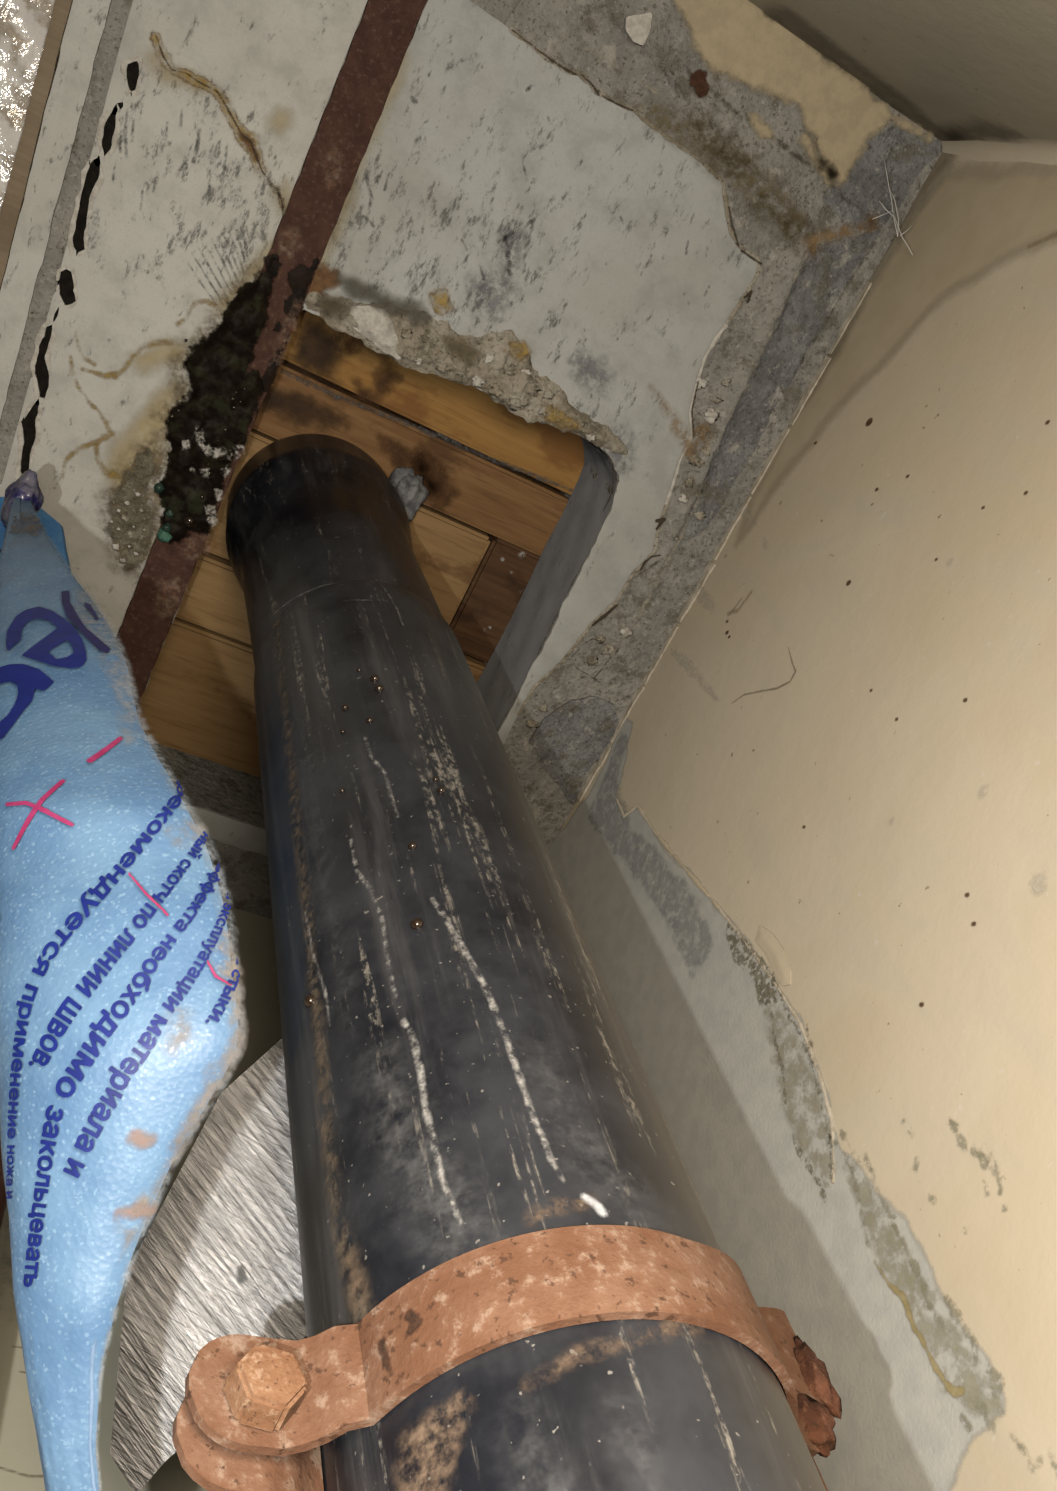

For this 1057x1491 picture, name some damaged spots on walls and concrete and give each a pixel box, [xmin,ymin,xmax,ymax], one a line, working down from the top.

corrosion [166,69,262,165]
leakage [66,187,400,571]
corrosion [279,264,449,359]
corrosion [446,340,479,362]
flaking render [304,291,628,455]
leakage [742,12,1057,534]
leakage [379,436,456,506]
peeling [503,0,1006,1491]